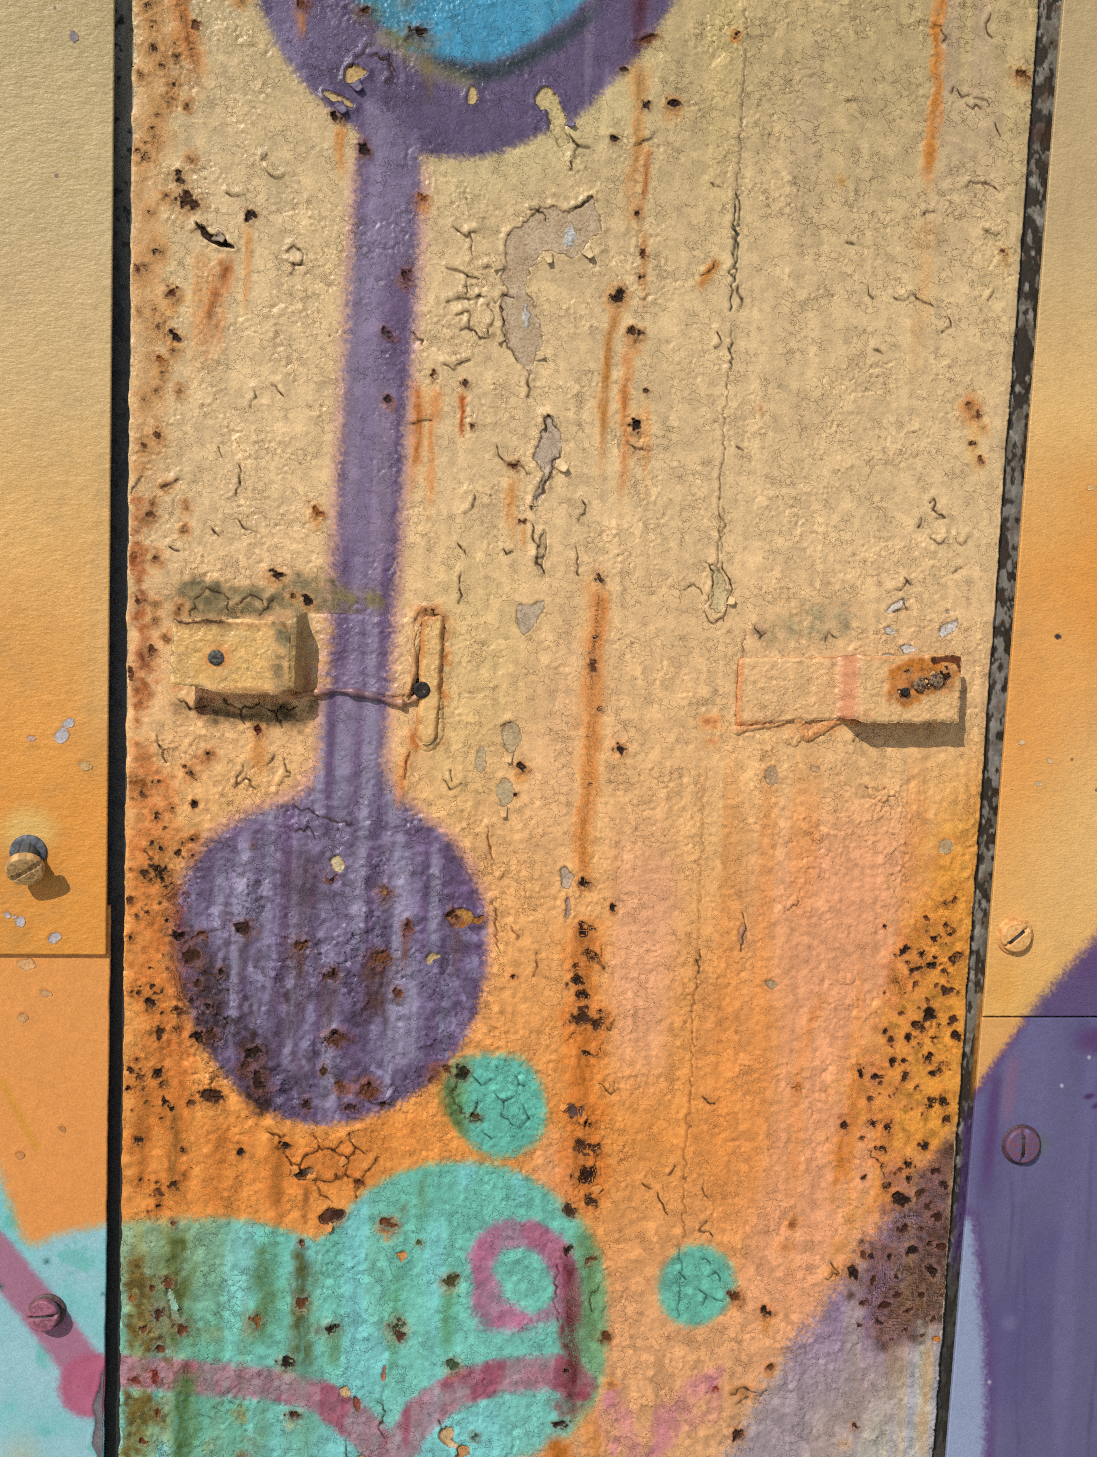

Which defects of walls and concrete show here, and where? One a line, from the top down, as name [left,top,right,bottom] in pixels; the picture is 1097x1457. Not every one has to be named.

peeling [492,196,602,398]
corrosion [596,66,683,483]
crack [711,10,749,563]
corrosion [124,0,290,1229]
peeling [527,415,569,574]
corrosion [574,569,628,889]
corrosion [886,655,961,708]
crack [267,1131,379,1202]
crack [471,1075,530,1138]
corrosion [553,920,615,1218]
corrosion [825,837,973,1432]
corrosion [120,1255,214,1457]